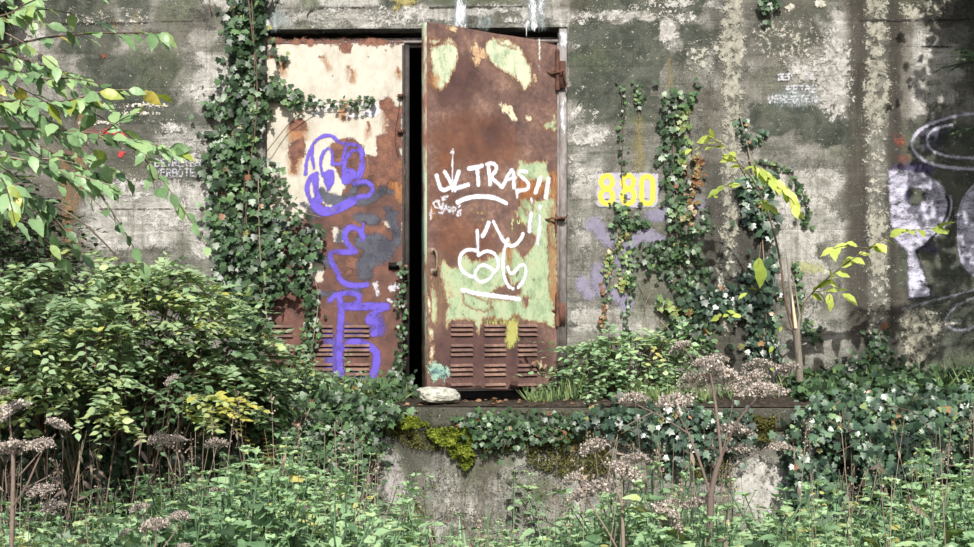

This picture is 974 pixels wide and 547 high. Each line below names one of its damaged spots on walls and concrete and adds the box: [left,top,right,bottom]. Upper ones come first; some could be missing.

corrosion [266,36,403,74]
corrosion [430,56,476,108]
efflorescence [455,0,466,27]
damp [524,0,544,65]
corrosion [265,96,407,381]
corrosion [518,172,558,299]
corrosion [432,259,549,383]